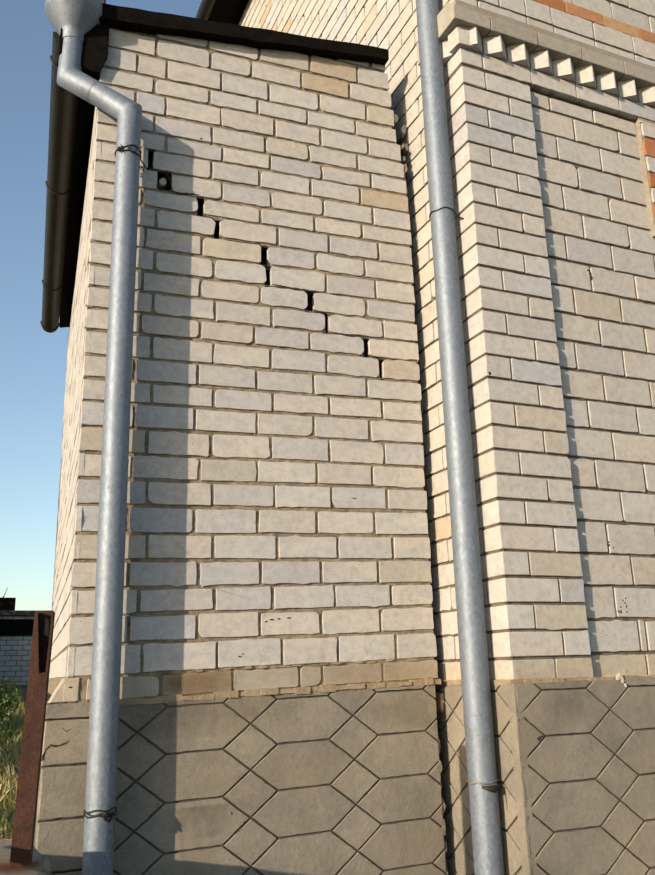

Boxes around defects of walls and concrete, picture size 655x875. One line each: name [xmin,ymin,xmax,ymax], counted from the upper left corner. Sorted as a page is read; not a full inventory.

crack [394,114,409,213]
crack [142,147,384,380]
crack [435,693,448,875]